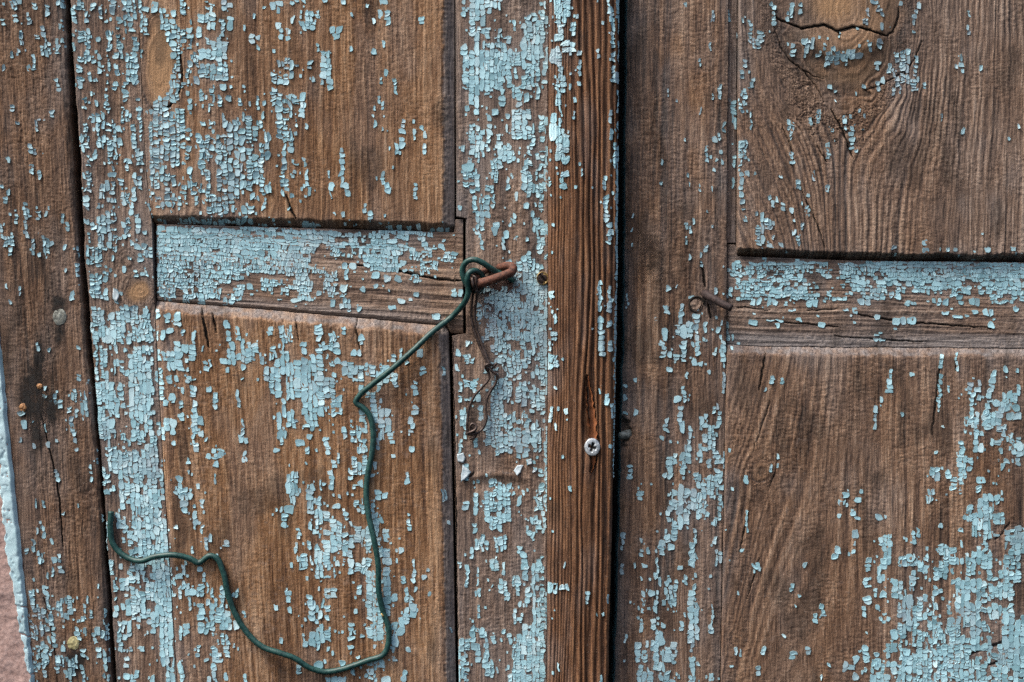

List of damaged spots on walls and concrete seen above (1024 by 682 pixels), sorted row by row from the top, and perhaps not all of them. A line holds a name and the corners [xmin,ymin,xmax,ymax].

peeling [0,0,458,682]
peeling [442,0,583,682]
peeling [592,0,638,478]
peeling [620,295,749,682]
peeling [684,218,708,267]
peeling [728,1,802,49]
crack [774,8,899,162]
peeling [787,0,926,96]
peeling [705,59,1024,342]
peeling [820,352,1024,682]